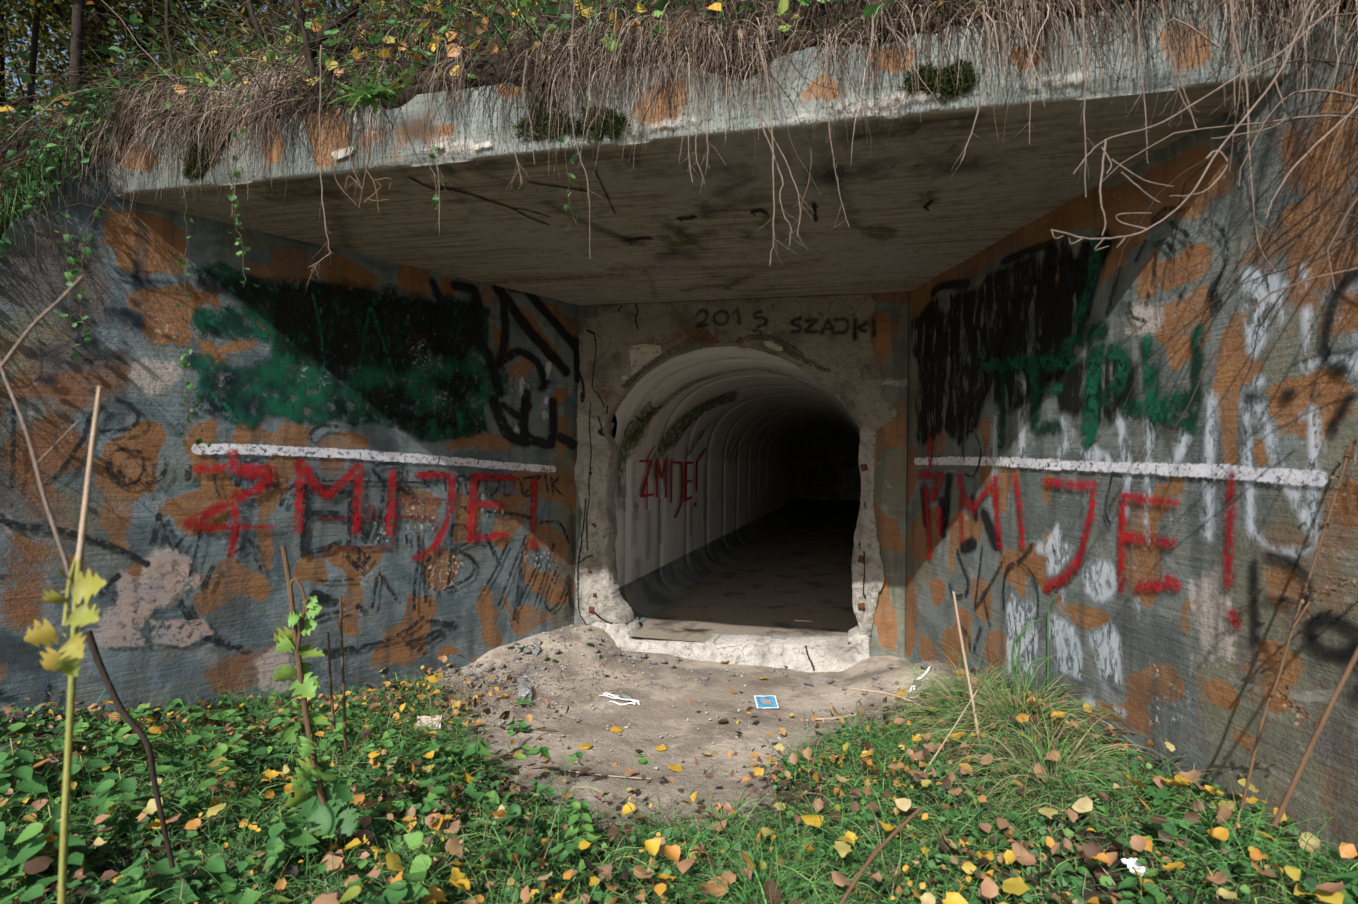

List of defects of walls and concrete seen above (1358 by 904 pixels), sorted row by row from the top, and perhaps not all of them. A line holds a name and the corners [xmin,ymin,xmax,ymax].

crack [409,169,615,226]
spalling [574,293,898,673]